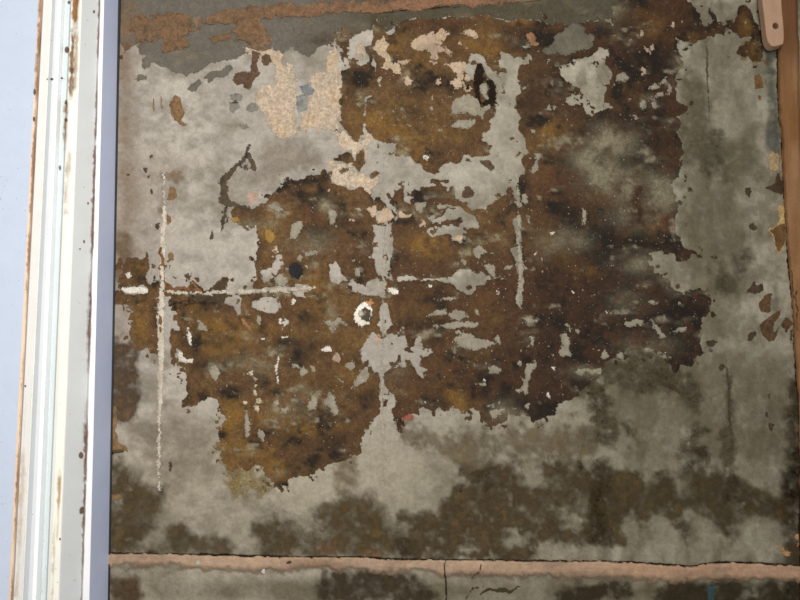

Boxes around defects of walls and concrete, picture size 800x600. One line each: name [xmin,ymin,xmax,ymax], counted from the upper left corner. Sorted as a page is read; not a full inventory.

water stain [681,78,752,176]
spalling [765,151,784,194]
peeling [115,0,763,493]
spalling [768,204,787,254]
crack [110,49,800,600]
spalling [745,282,793,342]
water stain [111,465,164,553]
water stain [150,525,231,556]
water stain [224,464,273,498]
water stain [252,348,800,565]